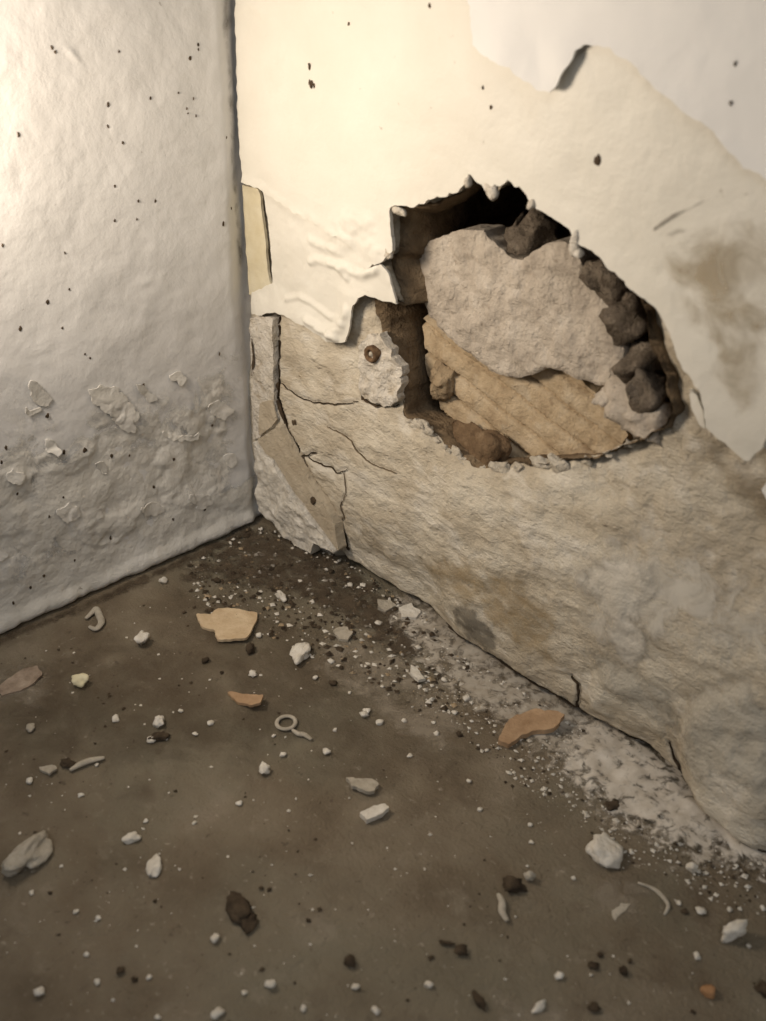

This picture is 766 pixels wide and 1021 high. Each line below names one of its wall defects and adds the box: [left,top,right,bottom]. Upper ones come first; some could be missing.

peeling [234,0,766,474]
peeling [0,371,257,634]
spalling [134,630,150,645]
crack [249,313,399,551]
damp [453,607,494,650]
damp [612,556,715,635]